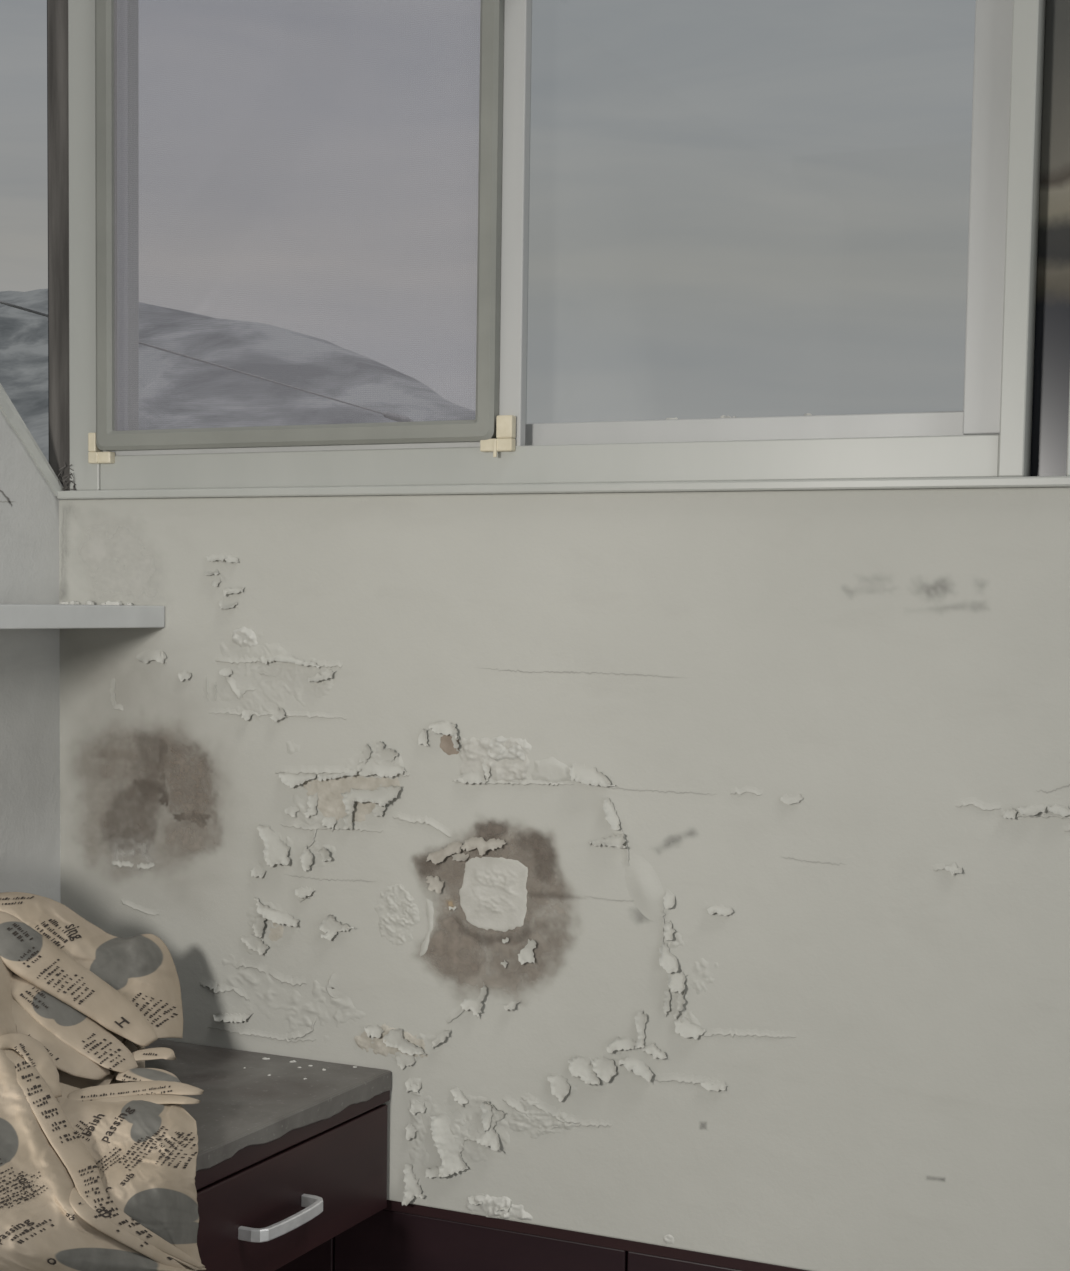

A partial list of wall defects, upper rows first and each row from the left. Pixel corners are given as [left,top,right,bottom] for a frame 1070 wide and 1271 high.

peeling [250,741,410,878]
spalling [418,721,717,869]
peeling [954,797,1070,832]
peeling [241,897,302,959]
leakage [393,811,566,991]
peeling [658,889,796,1039]
peeling [354,983,728,1206]
spalling [464,1193,533,1220]